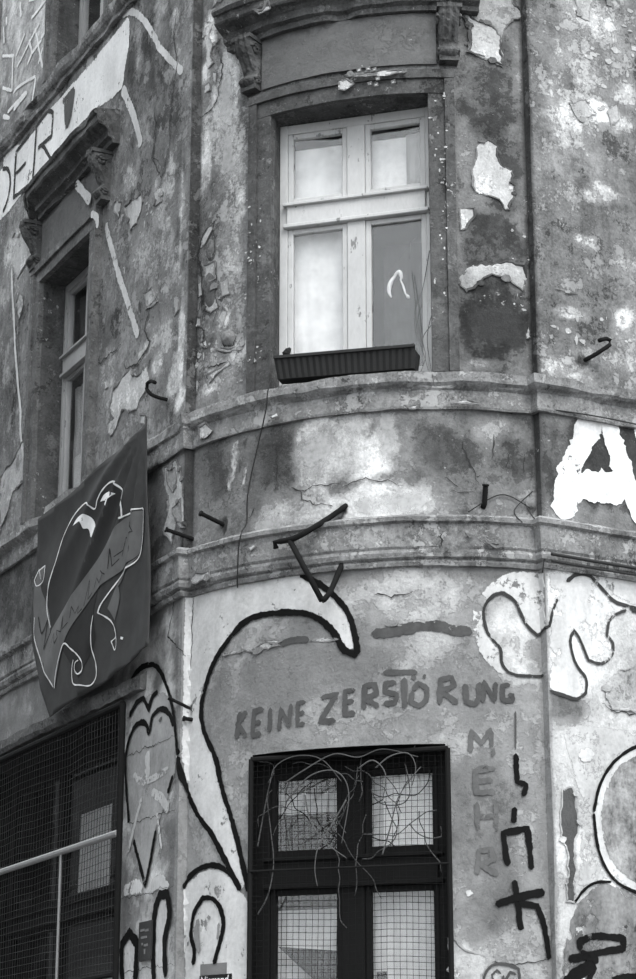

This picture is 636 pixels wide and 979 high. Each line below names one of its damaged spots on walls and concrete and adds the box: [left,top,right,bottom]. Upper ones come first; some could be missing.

flaking render [462,0,522,68]
flaking render [471,137,517,211]
flaking render [201,225,214,248]
flaking render [459,206,477,231]
flaking render [195,260,230,327]
flaking render [458,258,531,339]
flaking render [195,337,262,389]
flaking render [104,367,149,436]